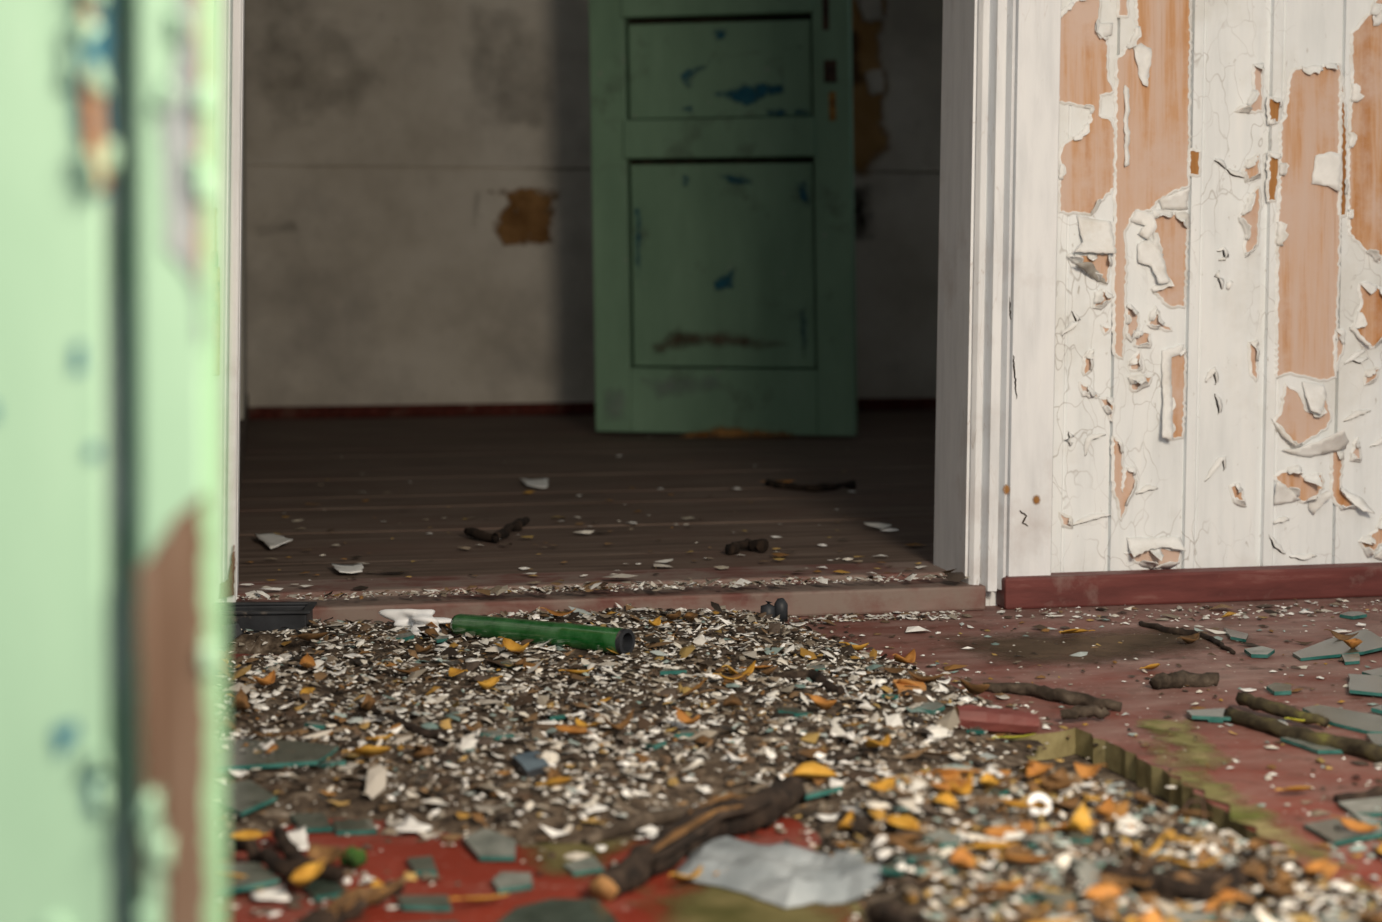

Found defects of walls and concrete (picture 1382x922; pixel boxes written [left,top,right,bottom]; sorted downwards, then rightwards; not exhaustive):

peeling [852,0,890,174]
peeling [490,188,559,245]
peeling [1057,0,1202,522]
peeling [1234,0,1382,560]
peeling [1058,512,1073,529]
peeling [1229,483,1247,507]
peeling [1124,536,1186,570]